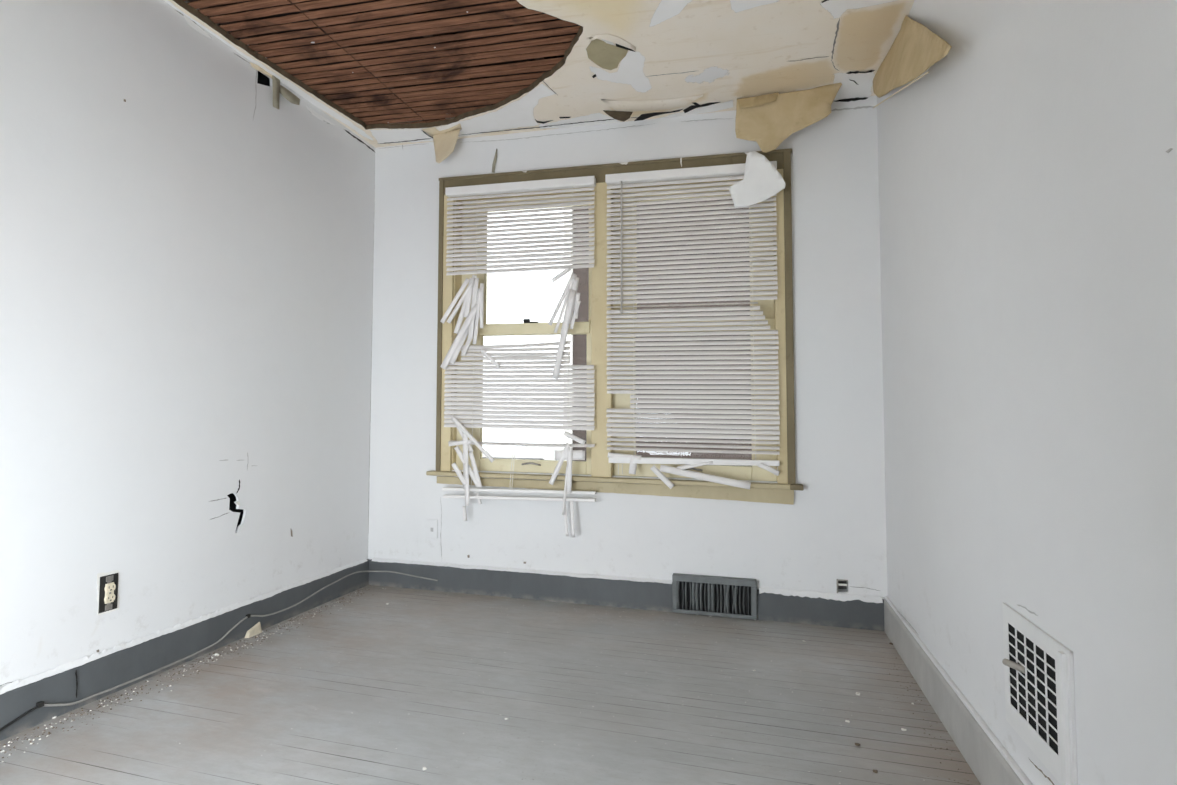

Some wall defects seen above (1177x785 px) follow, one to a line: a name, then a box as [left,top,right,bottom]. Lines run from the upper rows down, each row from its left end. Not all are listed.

peeling [820,0,897,19]
peeling [164,0,620,144]
peeling [589,51,652,93]
peeling [833,72,875,100]
peeling [656,100,733,119]
peeling [0,555,672,695]